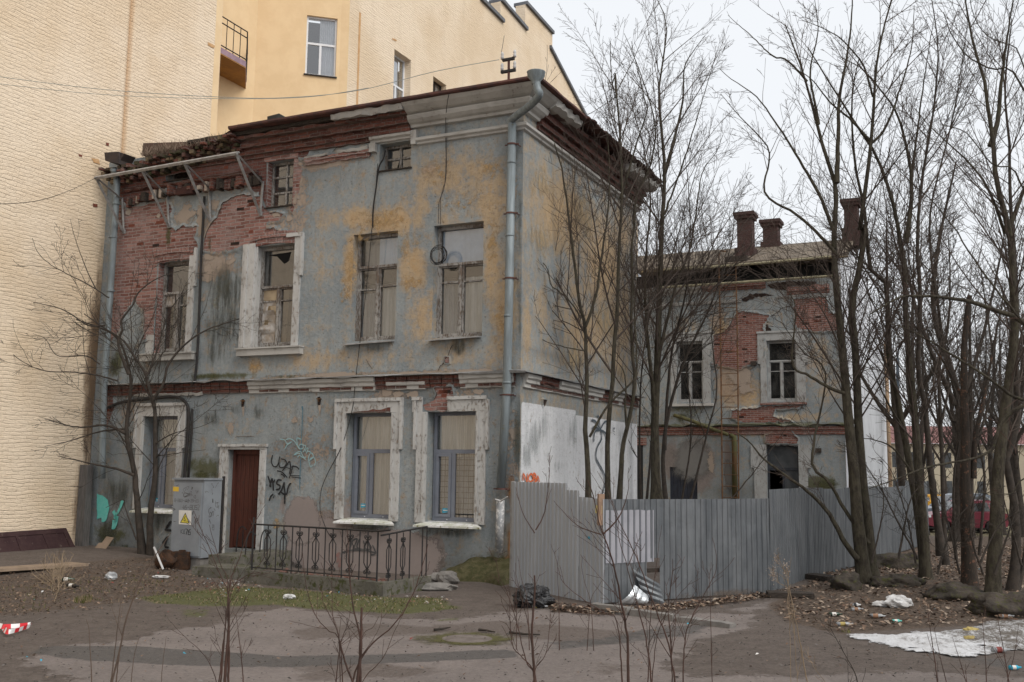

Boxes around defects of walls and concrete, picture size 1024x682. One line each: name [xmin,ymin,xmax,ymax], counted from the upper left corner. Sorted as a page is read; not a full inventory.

flaking render [110,158,304,345]
flaking render [388,355,494,412]
flaking render [709,280,837,447]